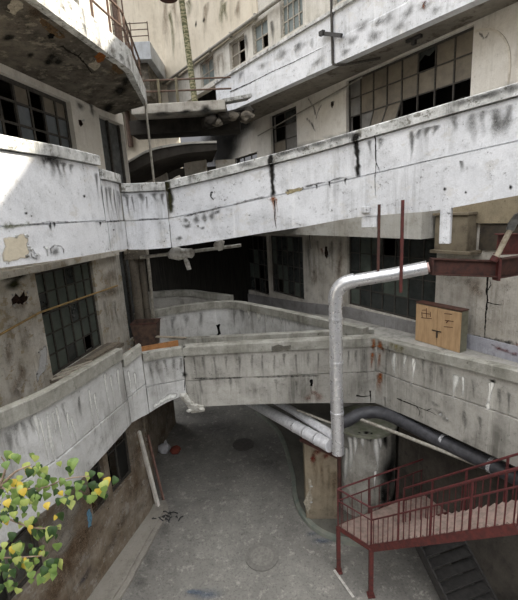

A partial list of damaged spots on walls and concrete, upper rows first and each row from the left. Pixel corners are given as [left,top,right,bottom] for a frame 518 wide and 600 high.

crack [60,45,92,74]
leakage [330,133,360,176]
leakage [268,151,288,196]
leakage [139,182,173,212]
peeling [3,234,31,262]
spalling [11,291,29,307]
crack [484,277,500,338]
leakage [392,346,416,375]
leakage [344,431,387,475]